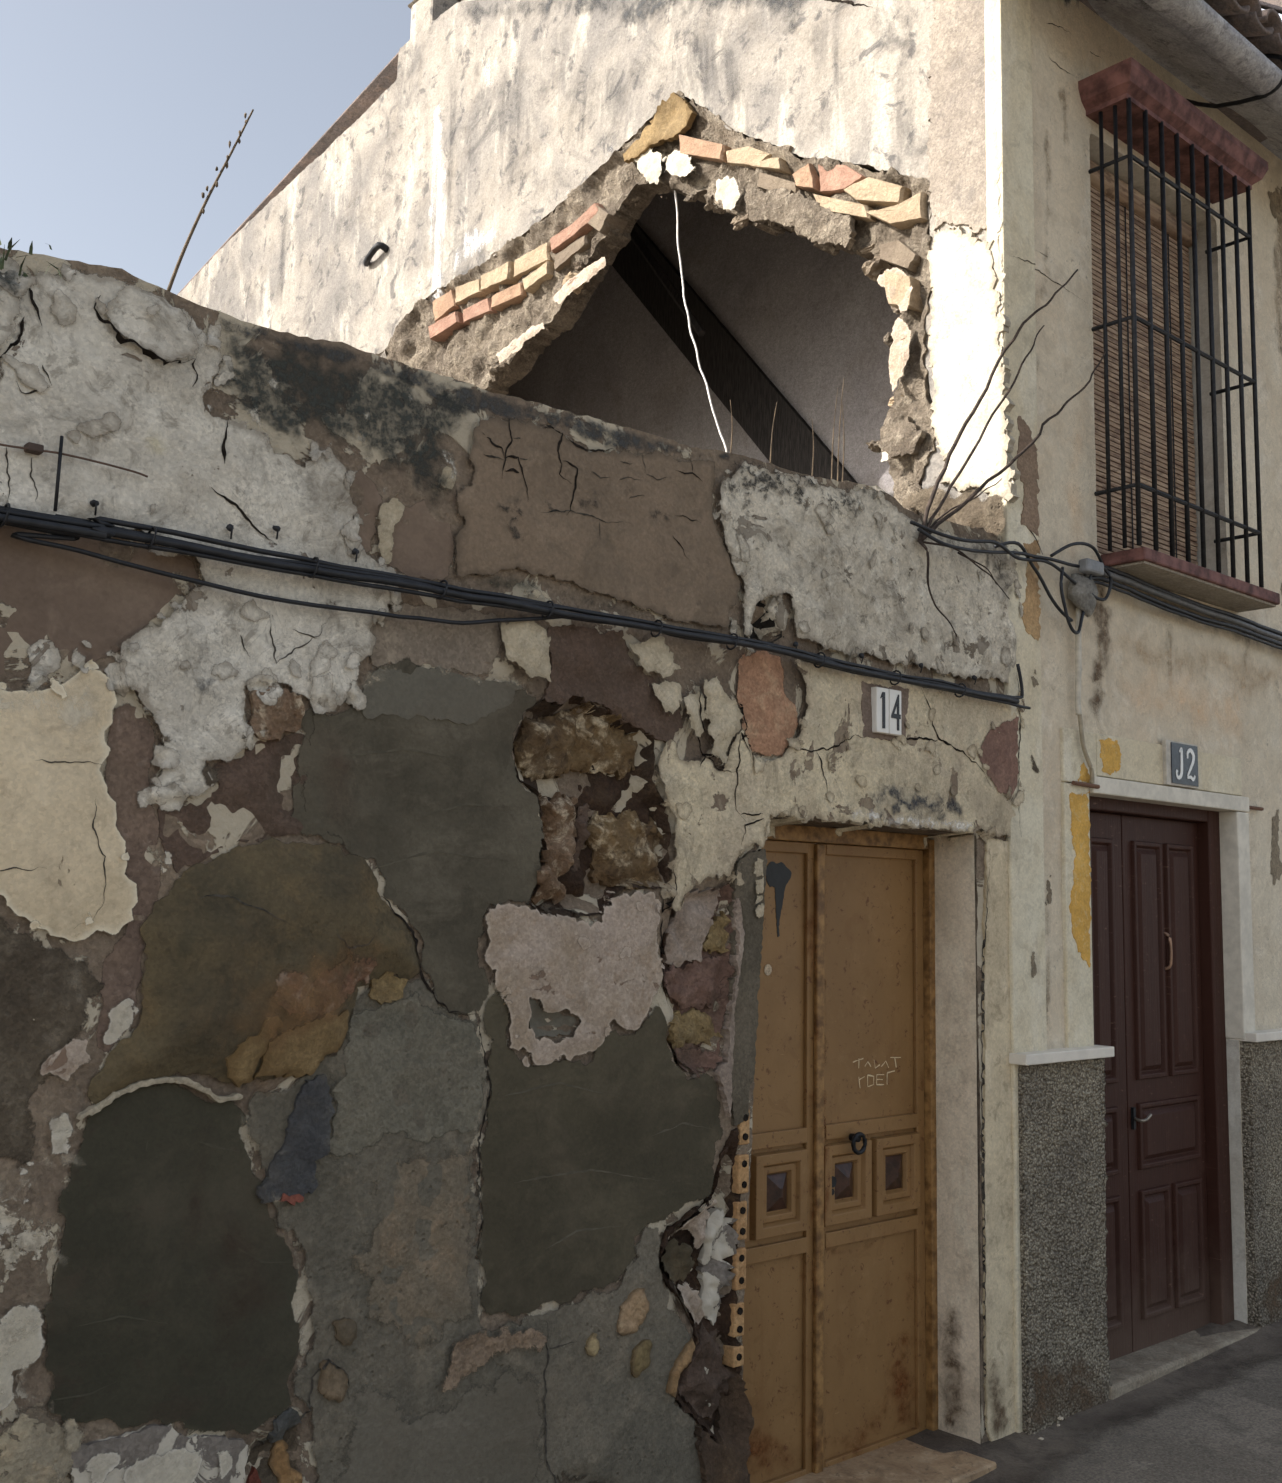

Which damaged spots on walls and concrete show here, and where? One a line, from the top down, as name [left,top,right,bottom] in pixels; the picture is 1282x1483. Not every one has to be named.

leakage [522,0,674,23]
crack [0,288,52,394]
crack [94,295,198,387]
flaking render [0,254,455,581]
leakage [221,325,673,496]
crack [483,419,702,531]
spalling [376,0,1041,684]
flaking render [1069,738,1122,967]
flaking render [0,525,1025,1483]